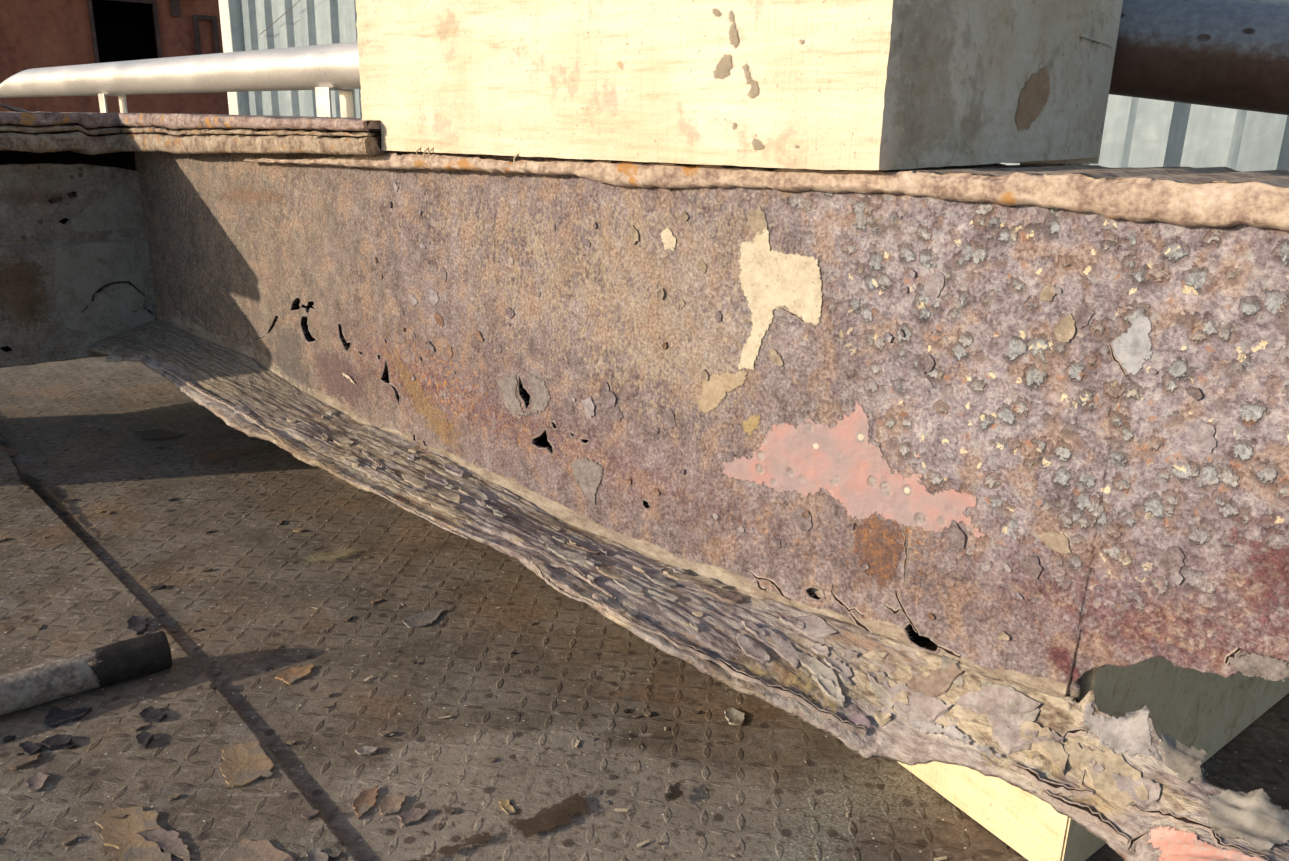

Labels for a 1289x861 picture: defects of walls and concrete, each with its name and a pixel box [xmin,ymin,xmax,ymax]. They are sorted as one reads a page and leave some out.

crack [81,281,155,314]
crack [300,330,318,388]
corrosion [313,345,365,404]
peeling [697,206,823,413]
spalling [533,422,556,454]
peeling [722,402,985,548]
corrosion [849,514,907,592]
crack [830,524,960,658]
corrosion [1229,528,1289,629]
crack [530,560,867,735]
corrosion [1229,651,1289,682]
peeling [736,615,1289,861]